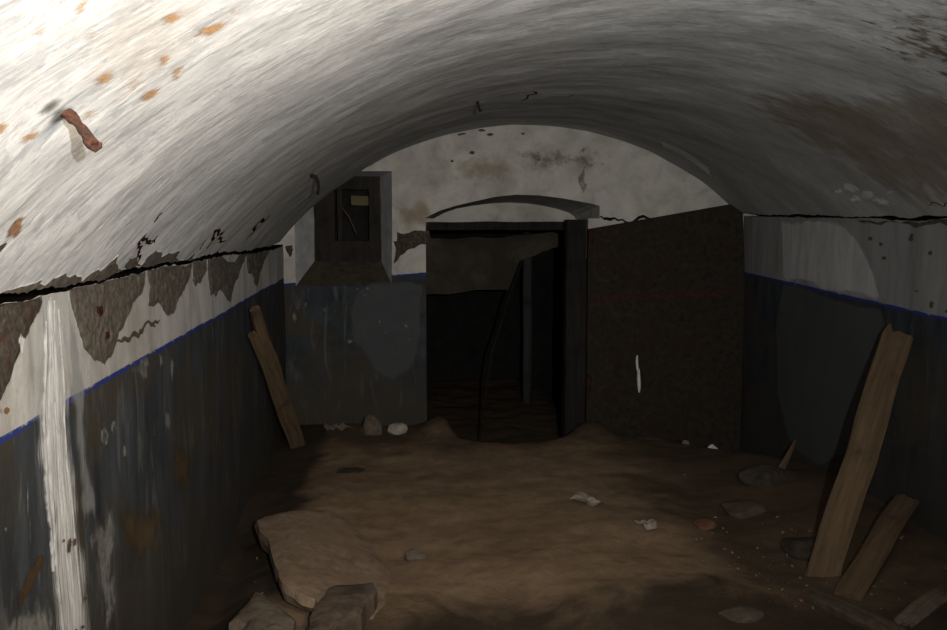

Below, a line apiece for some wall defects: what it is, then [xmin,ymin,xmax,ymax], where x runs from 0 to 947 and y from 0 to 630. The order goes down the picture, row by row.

flaking render [0,249,270,414]
crack [0,212,283,304]
crack [743,202,947,221]
damp [40,296,87,630]